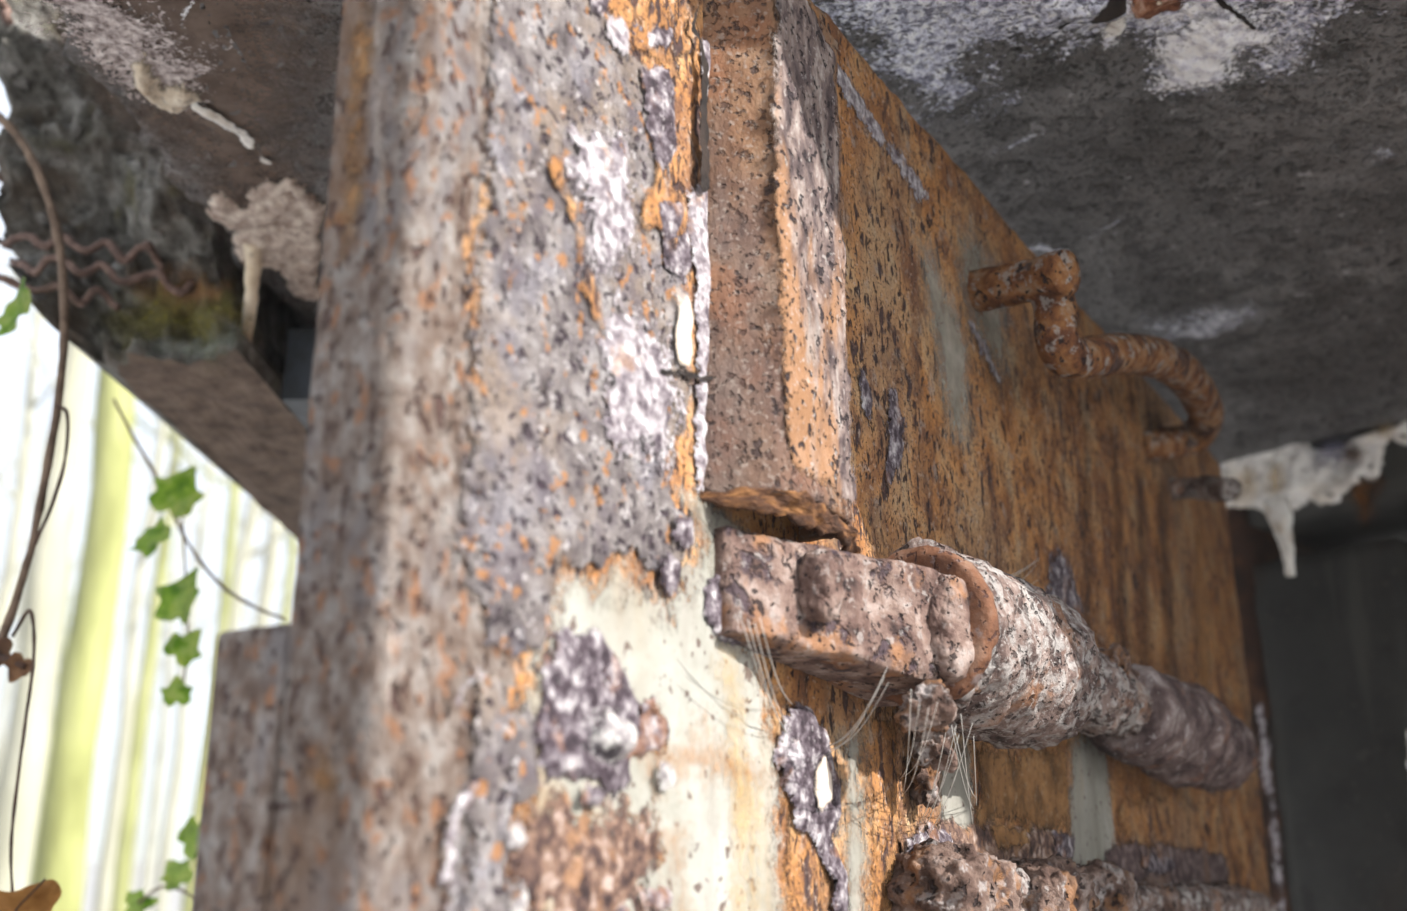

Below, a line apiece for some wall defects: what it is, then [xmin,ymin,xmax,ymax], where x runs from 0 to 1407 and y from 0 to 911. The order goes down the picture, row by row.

corrosion [608,0,700,66]
leakage [812,0,1363,131]
corrosion [548,155,604,327]
corrosion [642,163,688,250]
leakage [1220,419,1407,514]
corrosion [768,698,829,911]
corrosion [858,709,918,911]
corrosion [972,742,1072,833]
corrosion [1117,787,1174,849]